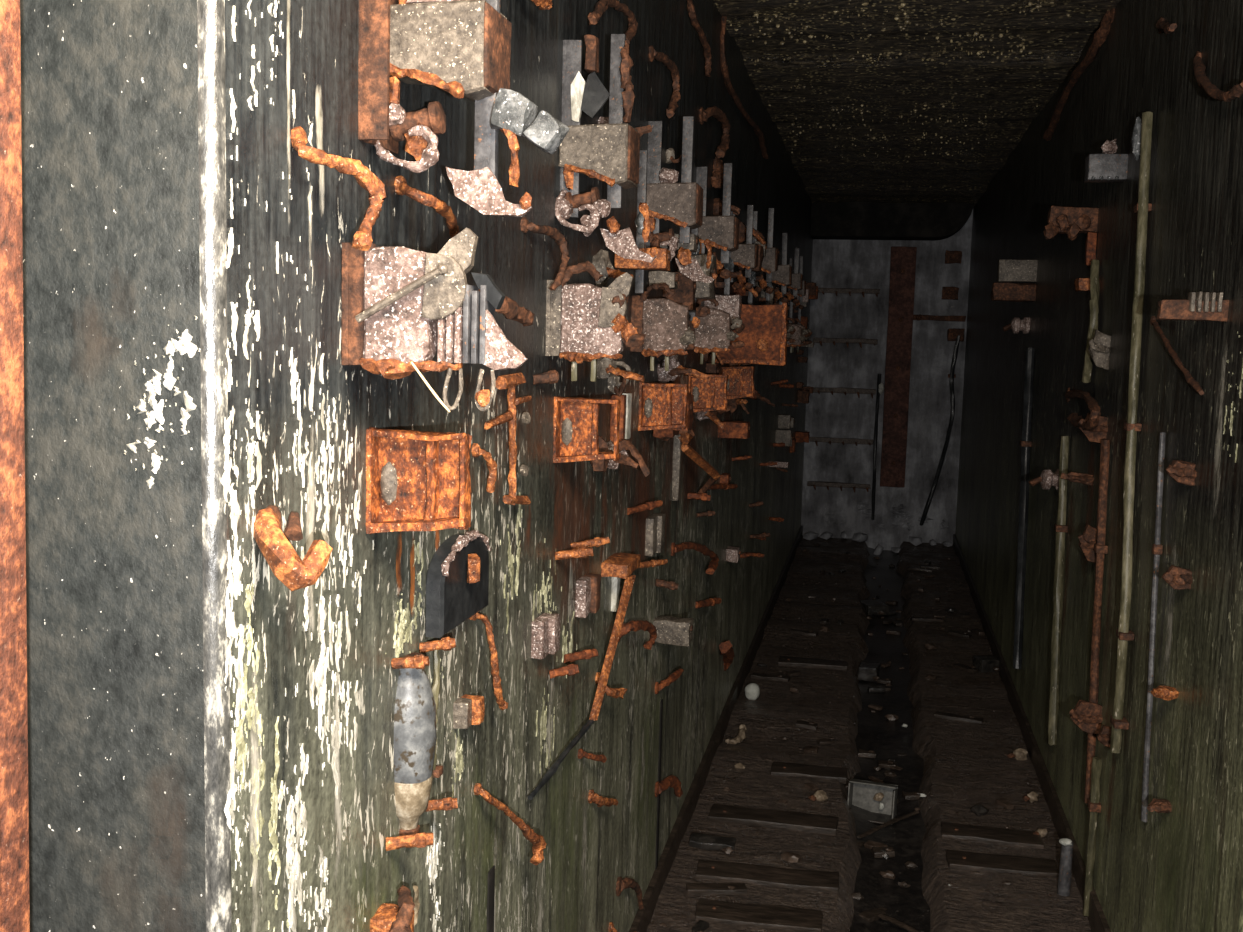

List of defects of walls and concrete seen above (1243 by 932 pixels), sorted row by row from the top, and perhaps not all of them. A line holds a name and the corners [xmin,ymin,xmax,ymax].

peeling [218,0,284,170]
peeling [276,242,312,302]
leakage [306,463,314,554]
peeling [218,327,374,932]
peeling [385,540,424,658]
leakage [251,736,260,888]
leakage [333,693,341,839]
peeling [427,810,445,932]
peeling [448,729,464,798]